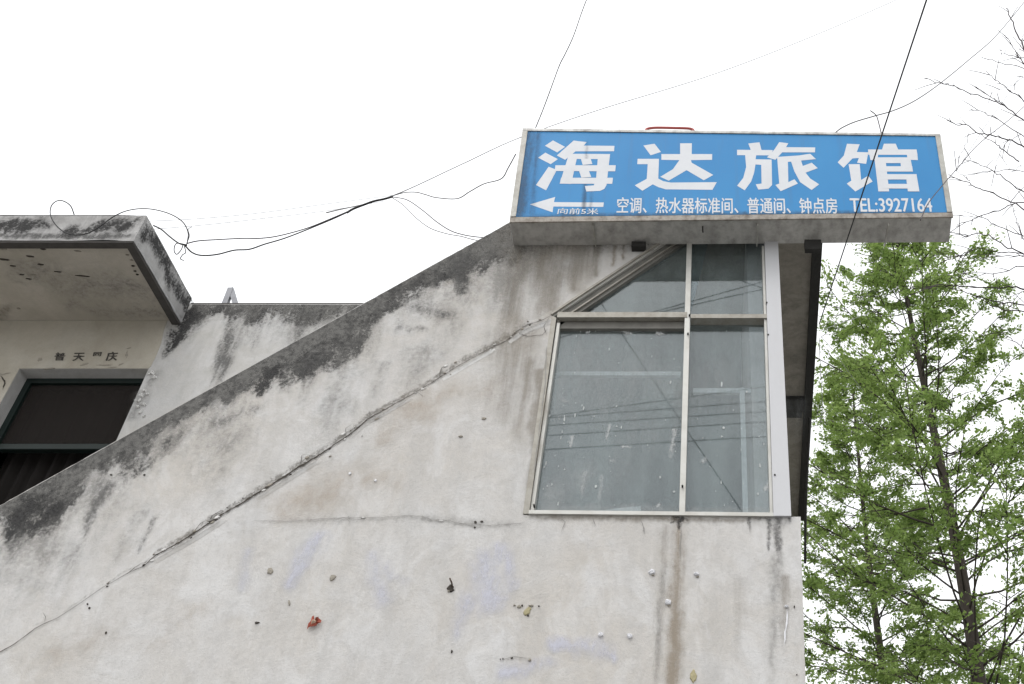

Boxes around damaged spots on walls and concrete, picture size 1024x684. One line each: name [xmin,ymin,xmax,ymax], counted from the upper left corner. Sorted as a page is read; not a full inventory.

leakage [0,218,527,543]
crack [0,318,552,652]
leakage [747,517,790,550]